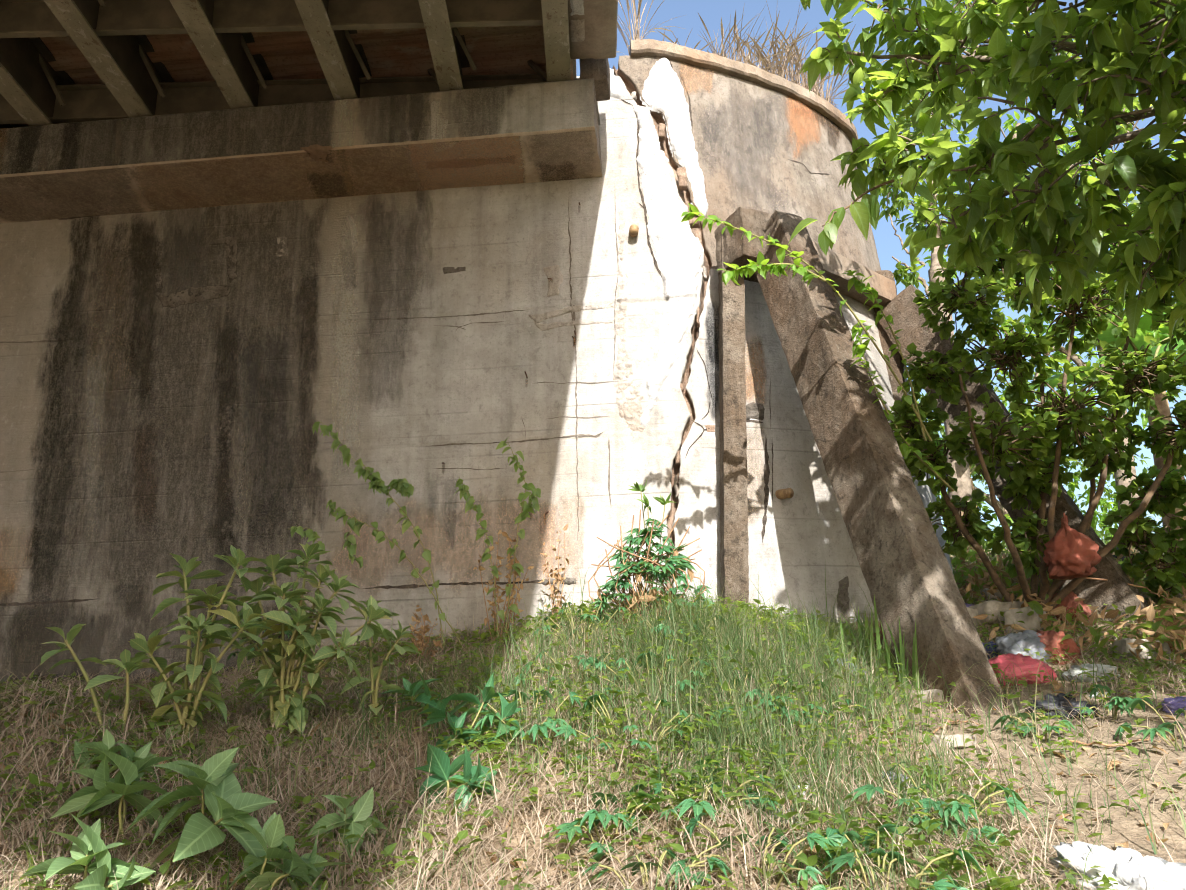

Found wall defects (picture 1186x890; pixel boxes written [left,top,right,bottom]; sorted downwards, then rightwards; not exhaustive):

water stain [0,86,513,688]
crack [427,416,611,504]
peeling [528,57,708,432]
crack [533,58,712,593]